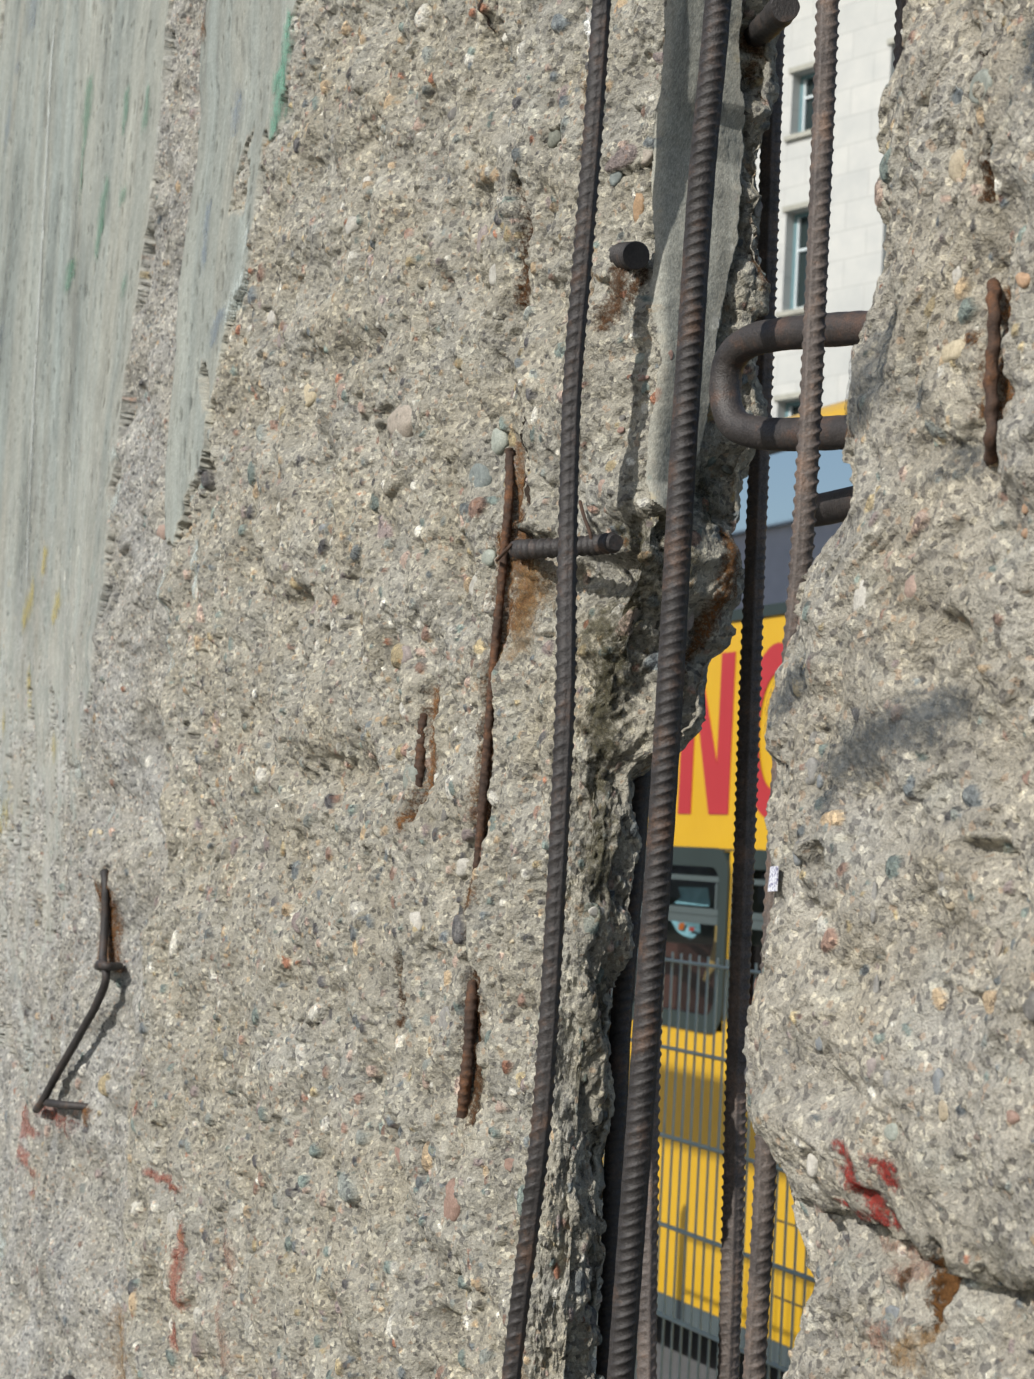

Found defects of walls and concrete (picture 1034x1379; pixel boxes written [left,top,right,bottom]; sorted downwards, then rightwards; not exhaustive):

spalling [755,28,785,322]
corrosion [593,265,653,332]
spalling [781,0,840,663]
corrosion [964,286,1015,420]
spalling [0,0,778,1379]
corrosion [394,685,440,832]
corrosion [467,442,549,838]
corrosion [95,874,125,973]
spalling [796,835,830,881]
corrosion [459,974,487,1130]
corrosion [891,1255,962,1366]